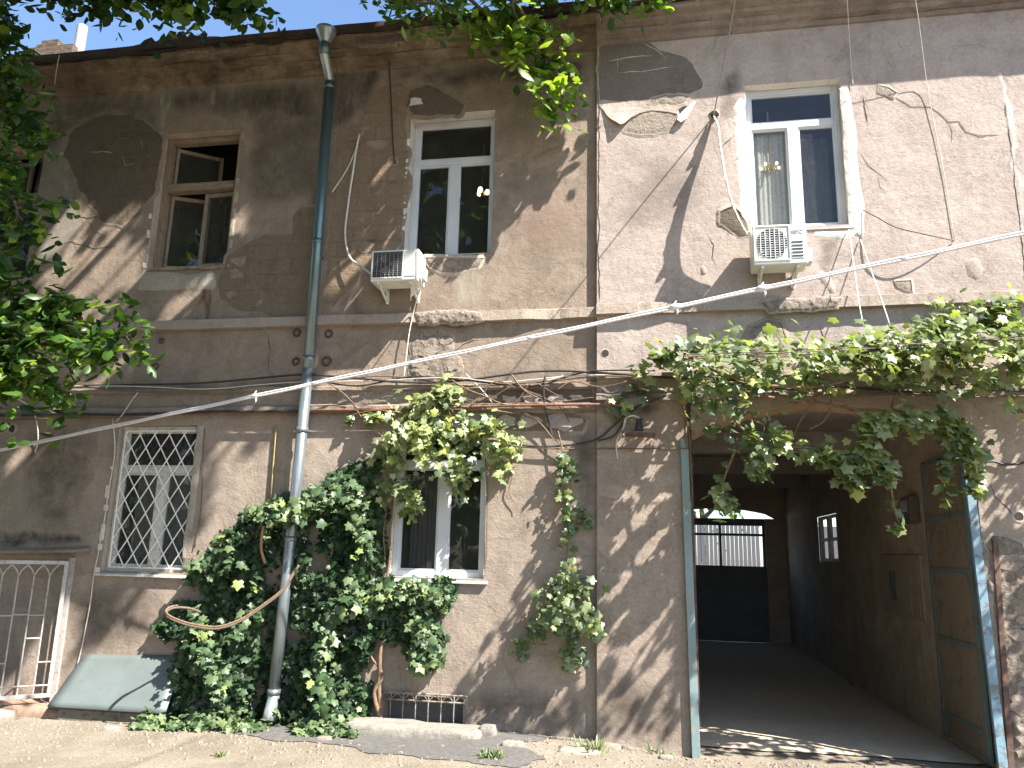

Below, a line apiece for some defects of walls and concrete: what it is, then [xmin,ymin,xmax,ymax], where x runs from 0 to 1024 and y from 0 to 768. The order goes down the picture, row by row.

flaking render [595,42,705,138]
flaking render [61,112,166,230]
flaking render [215,80,467,317]
flaking render [715,203,751,239]
crack [896,72,1024,259]
flaking render [334,309,484,405]
flaking render [481,381,659,436]